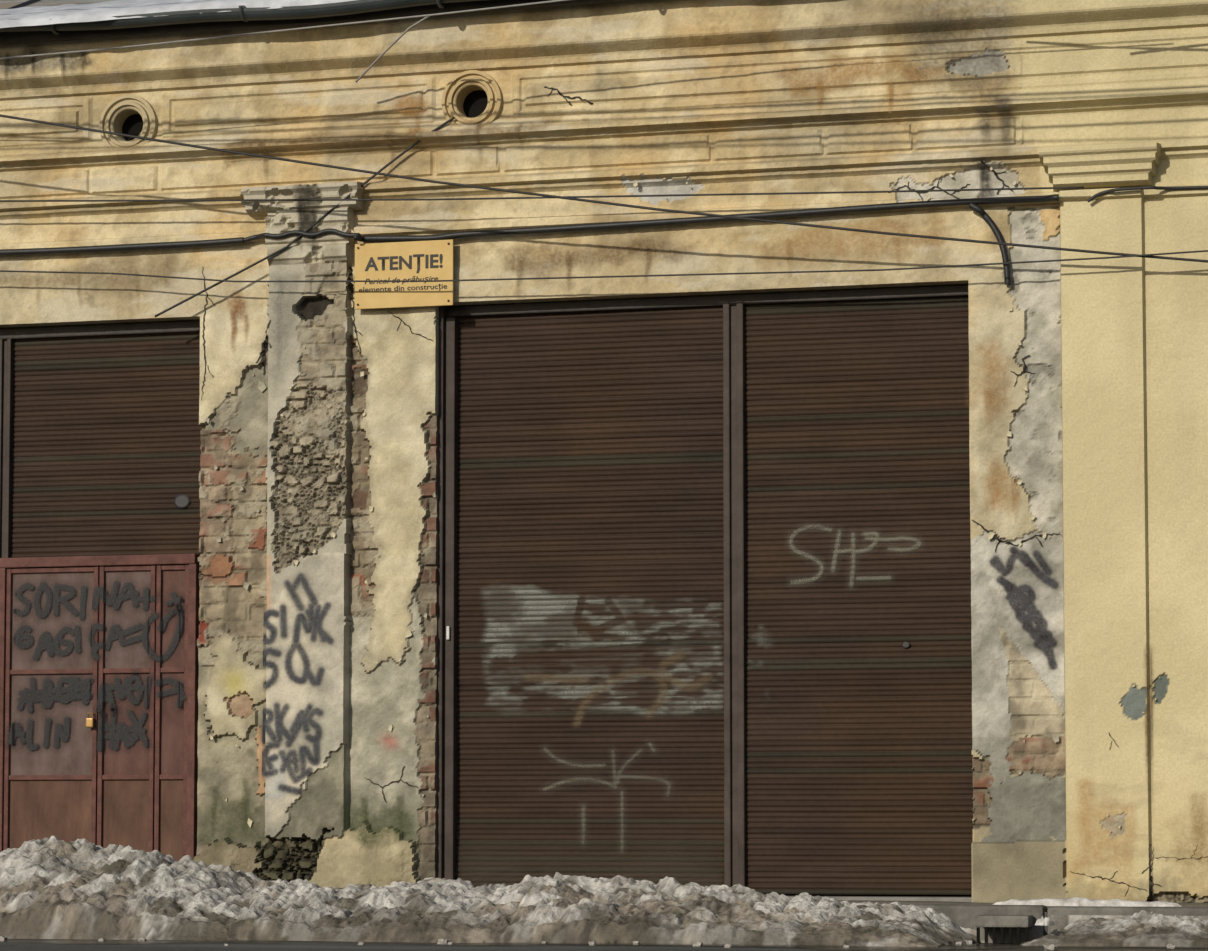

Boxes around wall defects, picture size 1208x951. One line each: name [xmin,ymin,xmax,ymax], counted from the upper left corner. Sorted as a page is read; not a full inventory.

peeling [947,47,1010,76]
crack [891,160,1014,200]
peeling [891,160,1066,828]
spalling [196,260,437,882]
peeling [1119,672,1170,719]
crack [1070,844,1208,902]